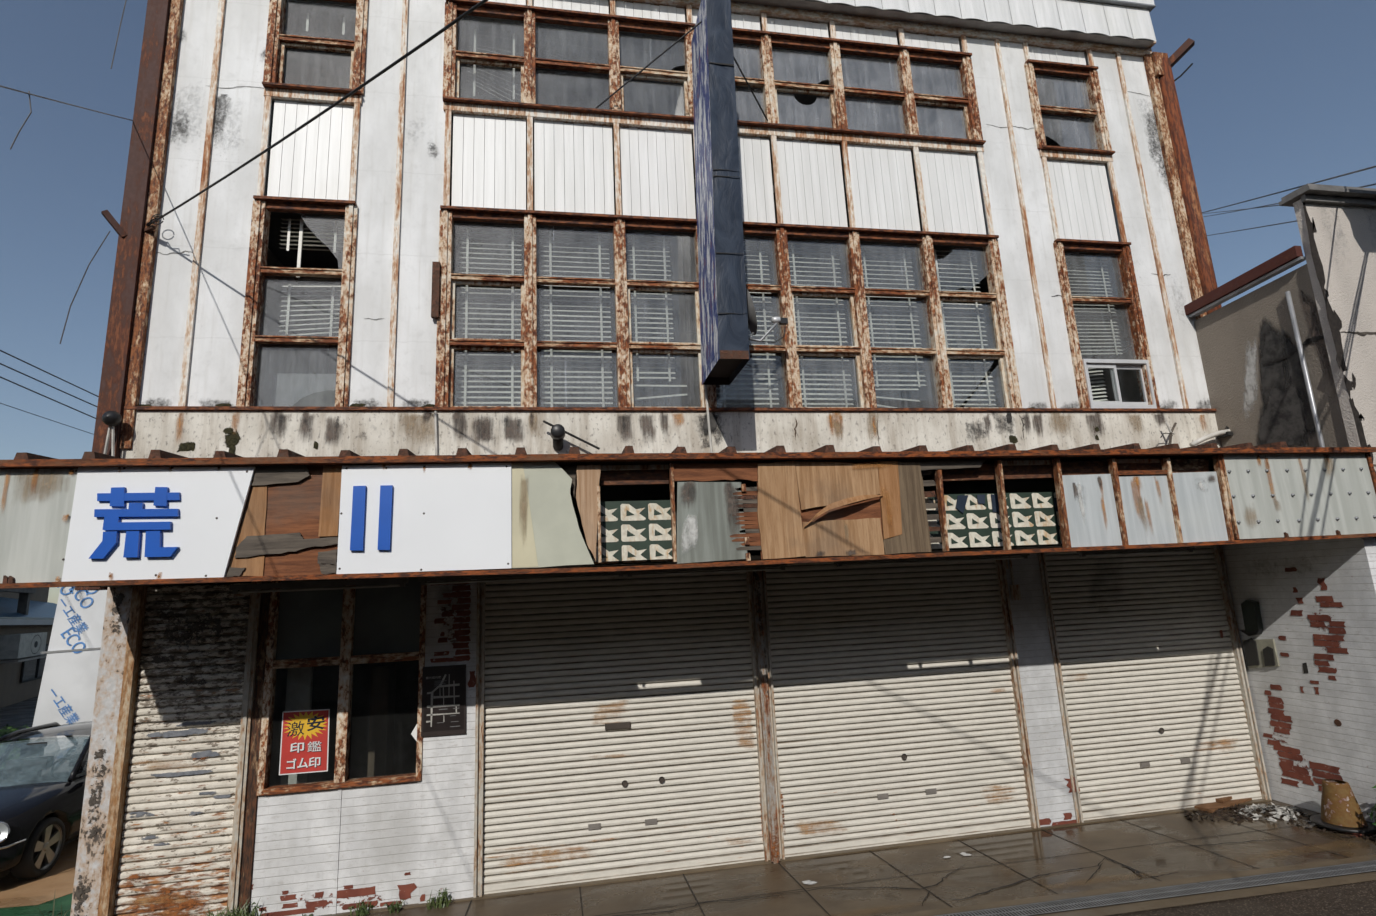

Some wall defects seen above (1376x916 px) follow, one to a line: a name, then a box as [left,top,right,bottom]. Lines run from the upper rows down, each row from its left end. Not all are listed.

water stain [1300,290,1330,375]
water stain [1244,318,1315,446]
water stain [453,411,537,440]
water stain [618,412,668,439]
water stain [699,412,721,447]
rust [1132,476,1150,519]
peeling [430,580,476,688]
peeling [1285,567,1349,695]
peeling [1263,684,1343,791]
peeling [259,872,425,916]